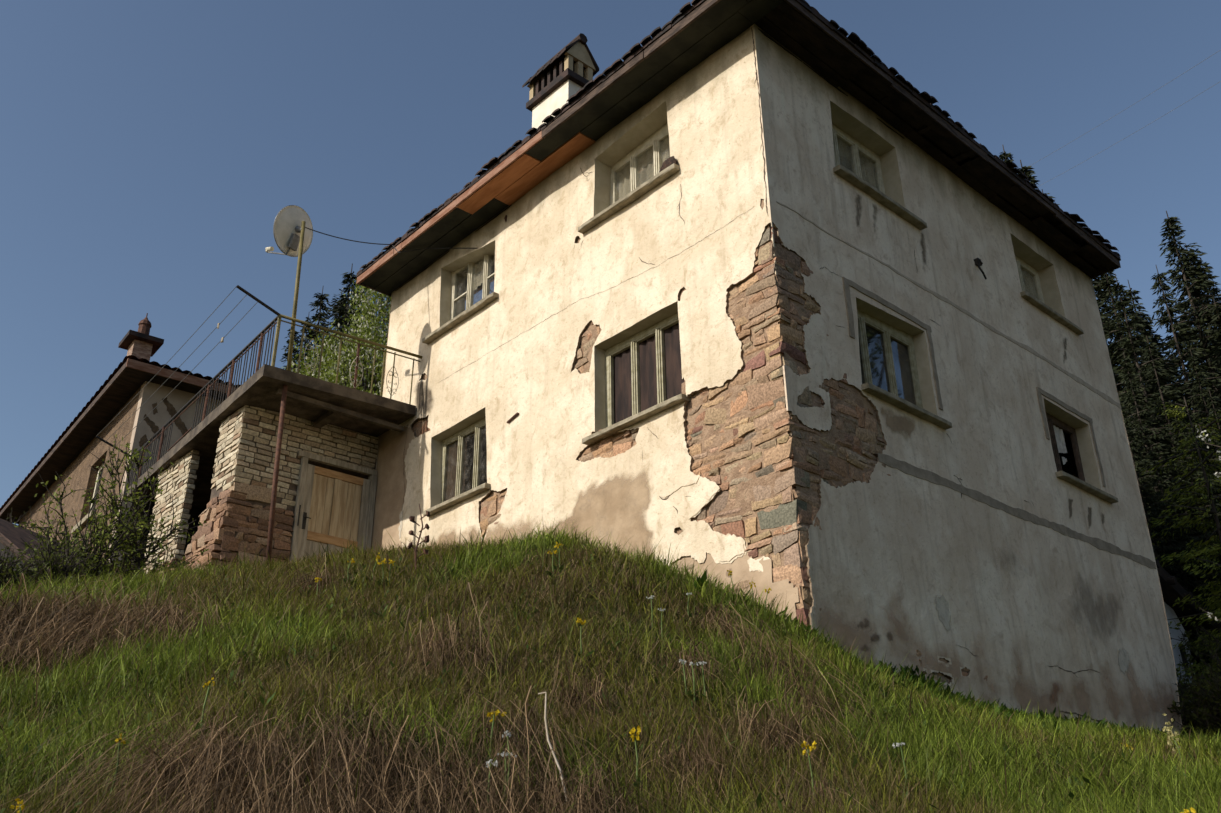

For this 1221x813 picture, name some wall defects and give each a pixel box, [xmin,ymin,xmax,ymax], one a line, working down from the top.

crack [438,27,768,383]
damp [429,524,541,548]
flaking render [480,489,507,536]
flaking render [545,200,1156,631]